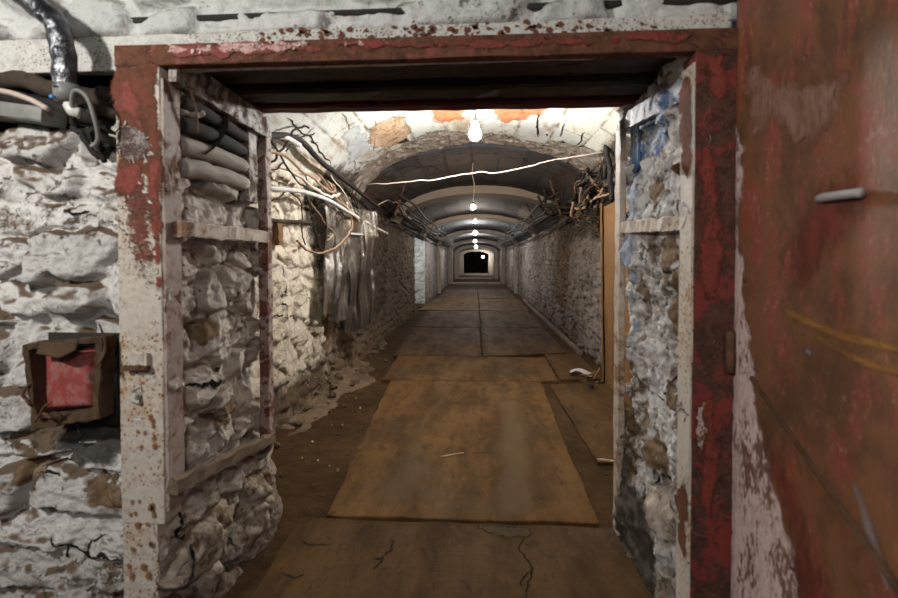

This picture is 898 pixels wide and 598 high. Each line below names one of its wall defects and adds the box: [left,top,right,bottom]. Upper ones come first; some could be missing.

peeling [167,40,321,59]
corrosion [259,26,374,42]
corrosion [391,19,619,37]
spalling [344,116,616,208]
peeling [111,76,163,299]
crack [185,364,222,389]
peeling [696,129,799,598]
corrosion [136,414,157,451]
corrosion [129,500,156,529]
crack [50,534,120,562]
crack [174,512,196,563]
crack [518,532,534,598]